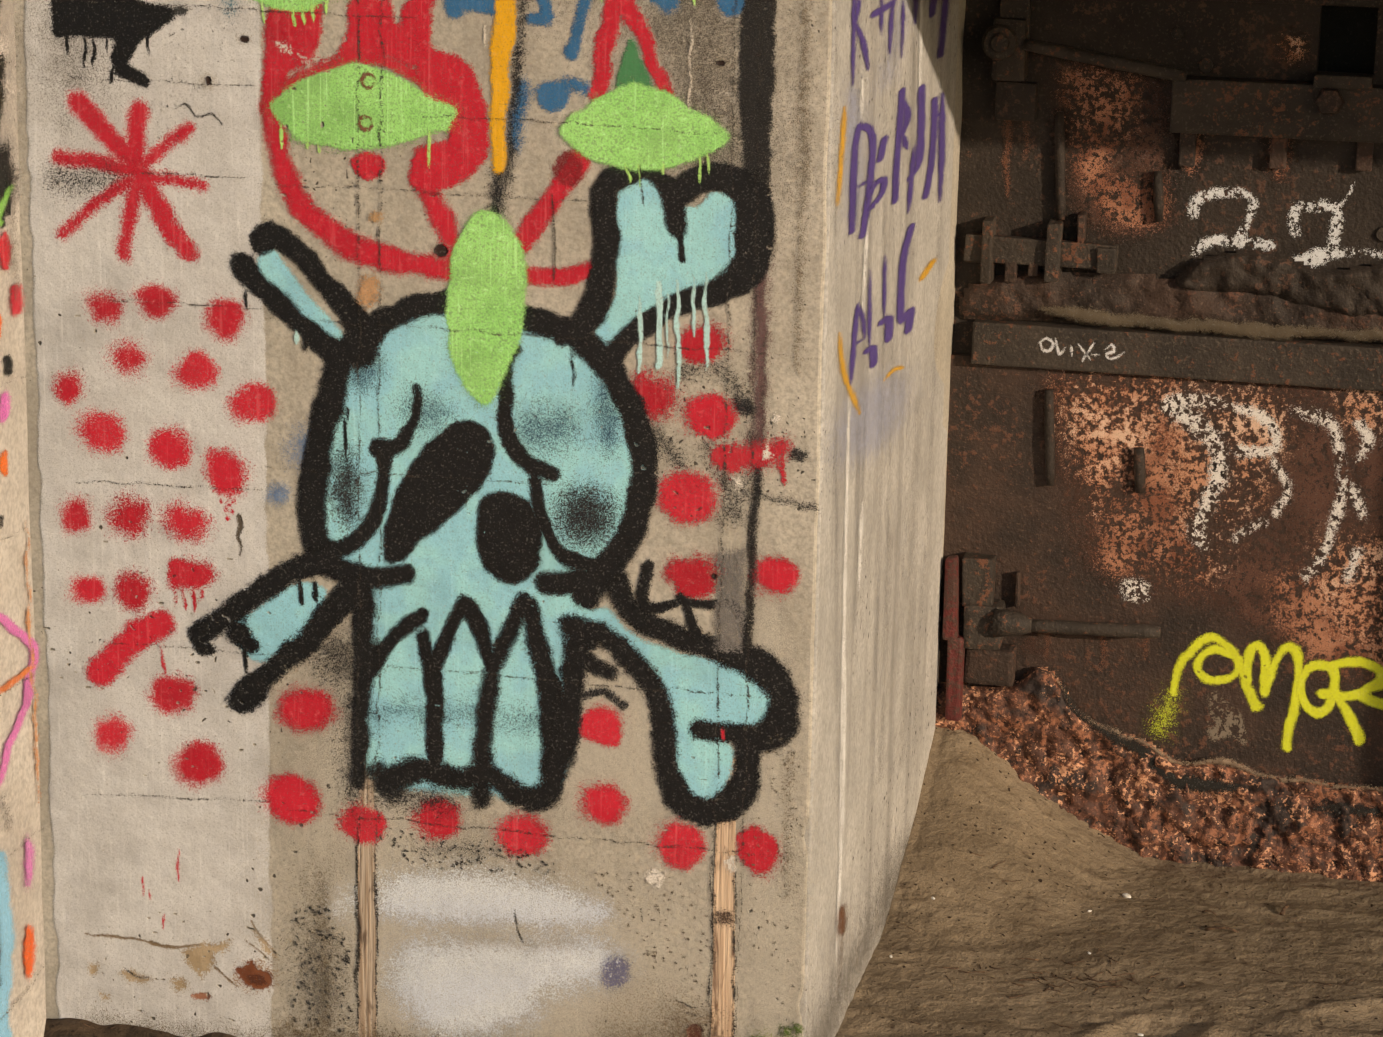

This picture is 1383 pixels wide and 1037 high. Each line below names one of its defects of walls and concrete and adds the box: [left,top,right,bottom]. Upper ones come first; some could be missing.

corrosion [1271,33,1311,65]
corrosion [1043,59,1208,248]
corrosion [1027,369,1383,694]